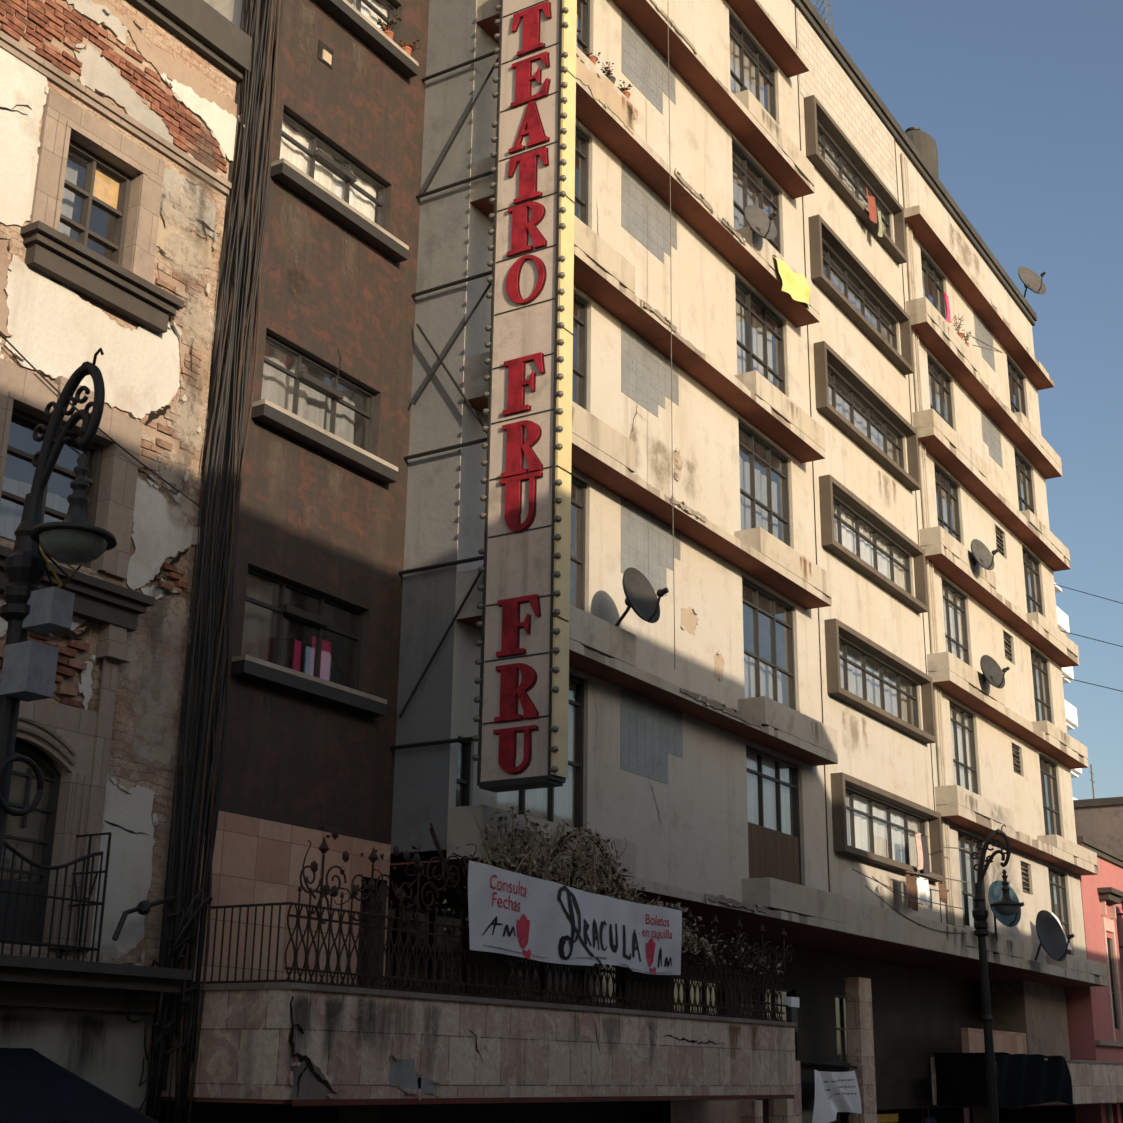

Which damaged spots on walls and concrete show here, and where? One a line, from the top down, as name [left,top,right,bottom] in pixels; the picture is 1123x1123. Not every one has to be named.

crack [0,105,31,115]
flaking render [0,0,244,600]
flaking render [0,594,8,680]
flaking render [27,616,96,710]
peeling [680,607,699,635]
crack [289,996,337,1097]
peeling [389,1055,440,1101]
crack [664,1035,724,1045]